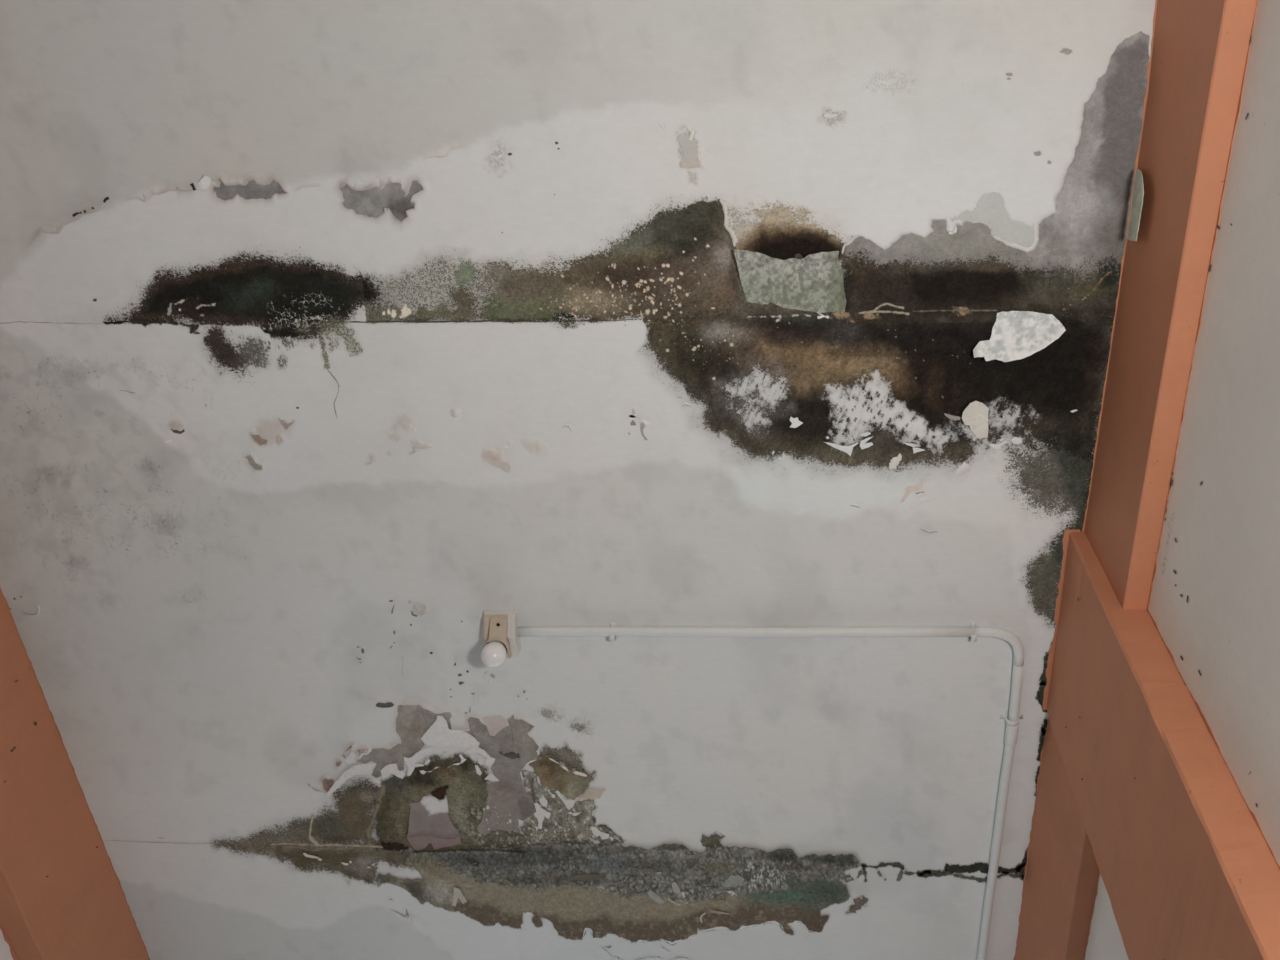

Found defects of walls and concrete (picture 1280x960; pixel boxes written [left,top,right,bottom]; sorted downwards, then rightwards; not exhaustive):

peeling [21,139,471,250]
peeling [659,121,700,183]
spalling [734,27,1150,362]
water stain [103,195,1121,796]
peeling [406,795,461,851]
peeling [316,657,592,835]